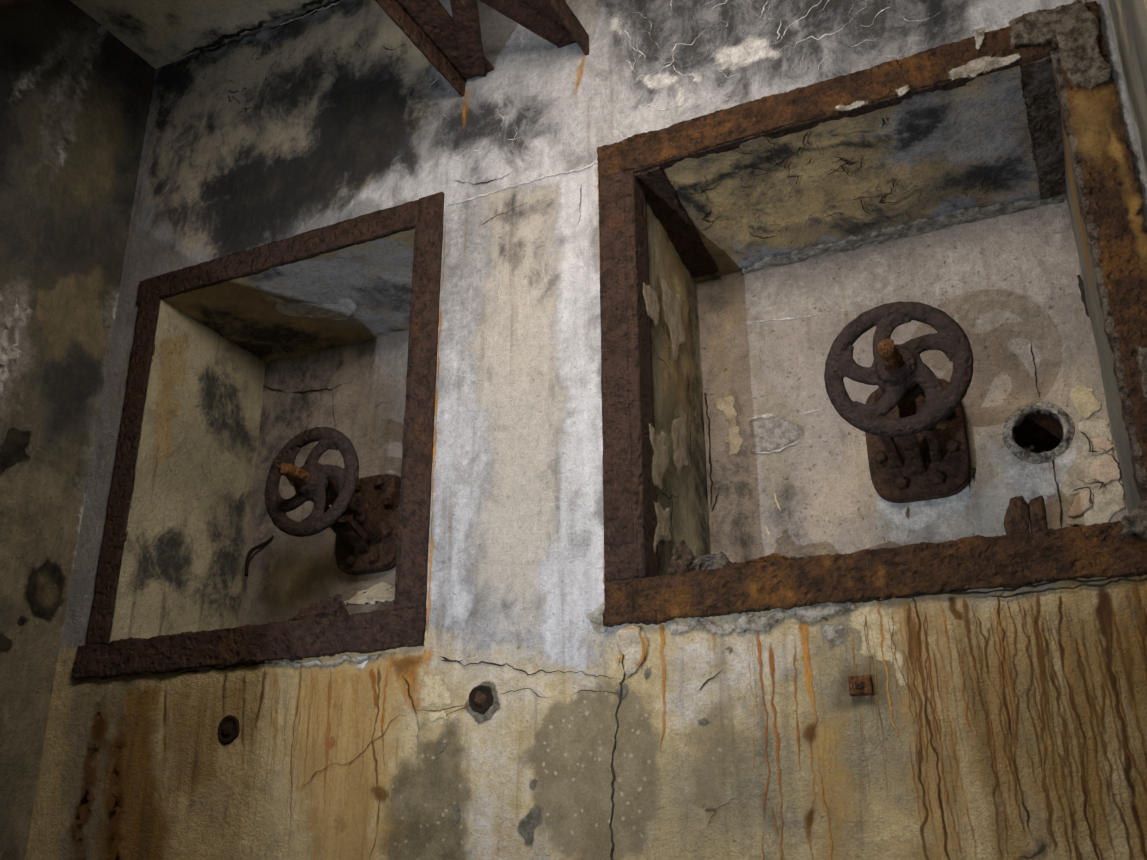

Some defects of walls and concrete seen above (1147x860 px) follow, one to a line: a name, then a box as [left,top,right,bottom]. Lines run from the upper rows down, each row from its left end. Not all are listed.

crack [177,0,344,93]
spalling [949,0,1112,89]
flaking render [643,278,686,361]
flaking render [649,413,688,554]
flaking render [1060,384,1147,538]
corrosion [241,652,431,860]
crack [301,677,470,788]
water stain [380,722,469,860]
crack [440,656,645,860]
water stain [527,684,657,860]
corrosion [756,633,783,860]
corrosion [851,586,1147,860]